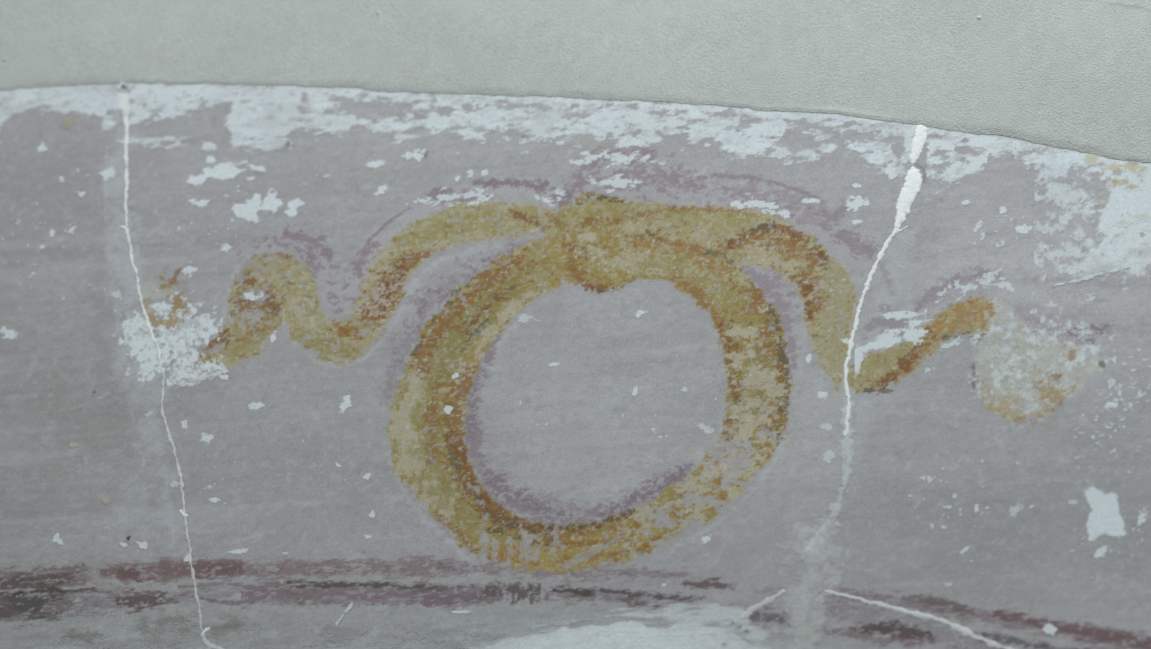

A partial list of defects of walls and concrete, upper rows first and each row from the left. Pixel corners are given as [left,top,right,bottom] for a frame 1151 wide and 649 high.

peeling [0,82,1151,411]
crack [116,83,226,649]
crack [803,125,931,552]
peeling [180,419,215,444]
peeling [338,394,353,415]
peeling [1064,485,1149,559]
crack [740,588,786,619]
crack [824,589,1016,649]